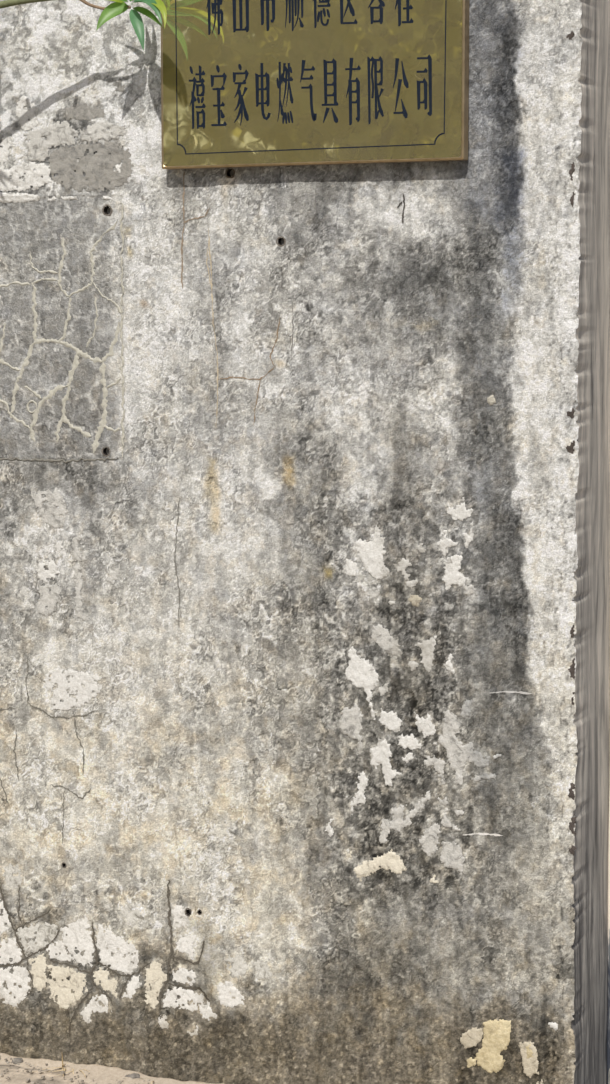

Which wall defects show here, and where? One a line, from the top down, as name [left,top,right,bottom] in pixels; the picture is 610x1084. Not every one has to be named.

peeling [345,523,422,607]
peeling [417,497,478,597]
peeling [371,624,455,674]
crack [0,880,210,1038]